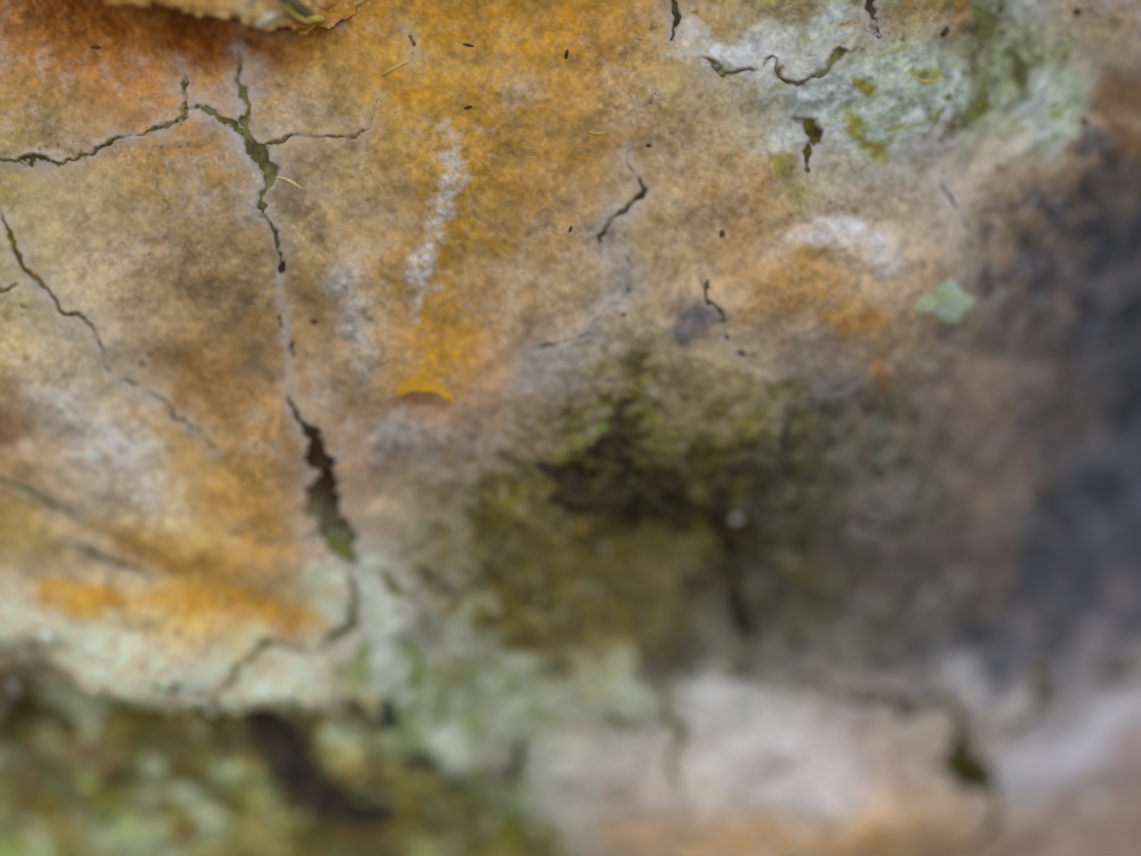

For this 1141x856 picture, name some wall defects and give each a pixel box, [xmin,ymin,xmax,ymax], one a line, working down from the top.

crack [0,50,292,252]
crack [329,98,378,139]
crack [408,35,416,55]
crack [670,0,681,41]
crack [707,47,846,86]
crack [865,0,882,39]
crack [0,218,216,450]
leakage [337,0,1141,747]
crack [0,477,158,581]
crack [149,565,359,705]
crack [381,571,422,627]
crack [720,670,1003,856]